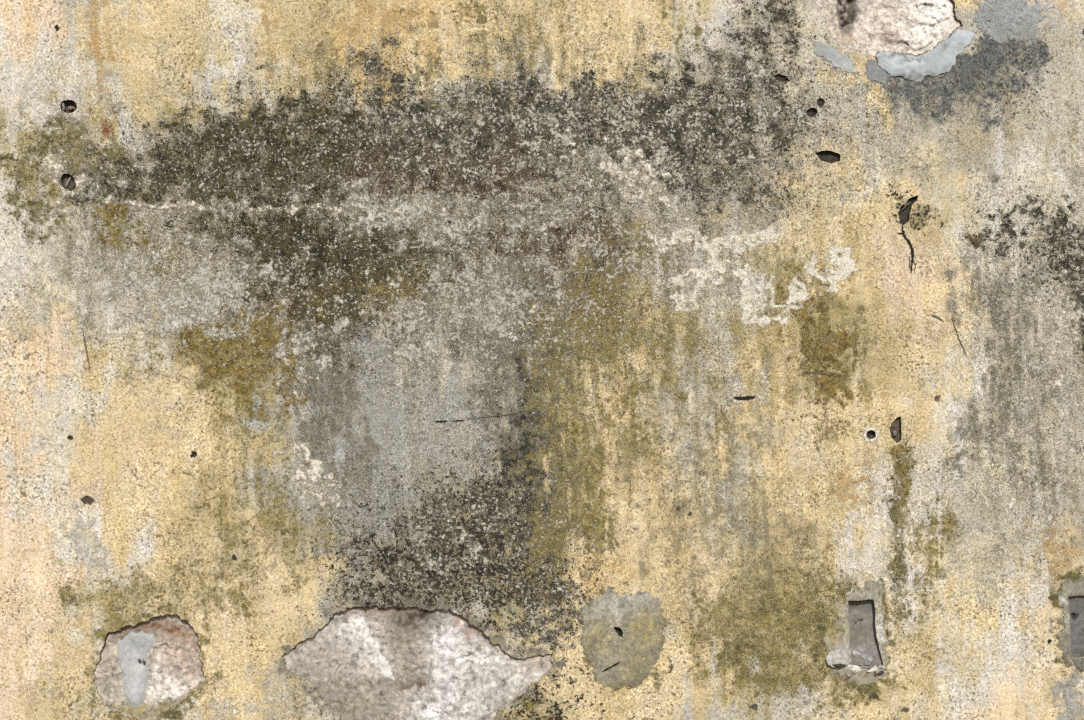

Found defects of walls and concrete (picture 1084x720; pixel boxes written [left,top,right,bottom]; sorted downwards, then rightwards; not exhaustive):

spalling [816,0,963,56]
crack [897,225,916,273]
water stain [708,391,730,443]
water stain [724,363,781,410]
water stain [800,246,880,419]
water stain [921,163,1084,559]
spalling [93,614,206,720]
spalling [282,605,553,720]